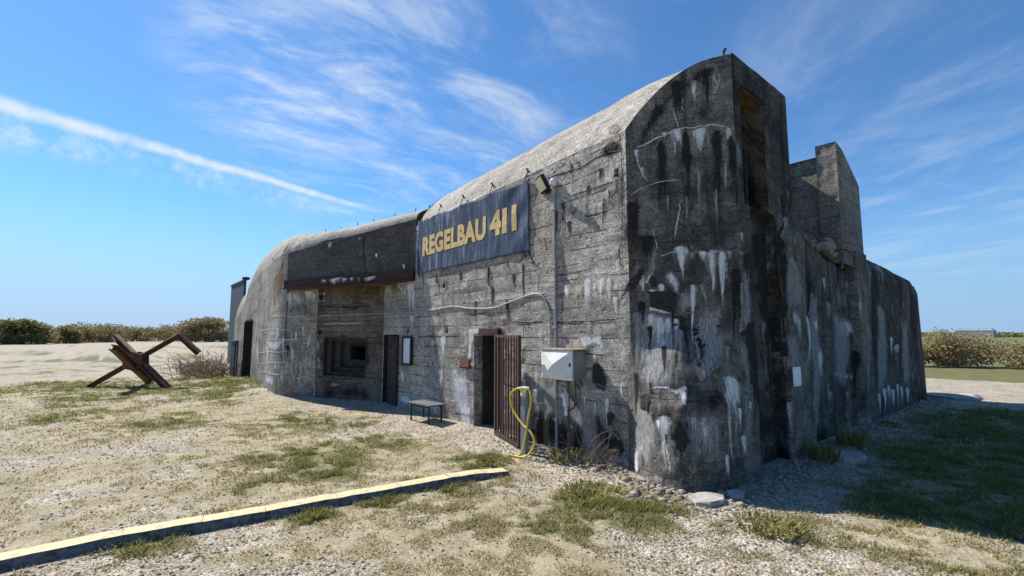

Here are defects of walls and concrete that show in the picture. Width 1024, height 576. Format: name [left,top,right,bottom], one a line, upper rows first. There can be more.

crack [548,74,730,266]
damp [644,68,739,220]
damp [525,164,918,483]